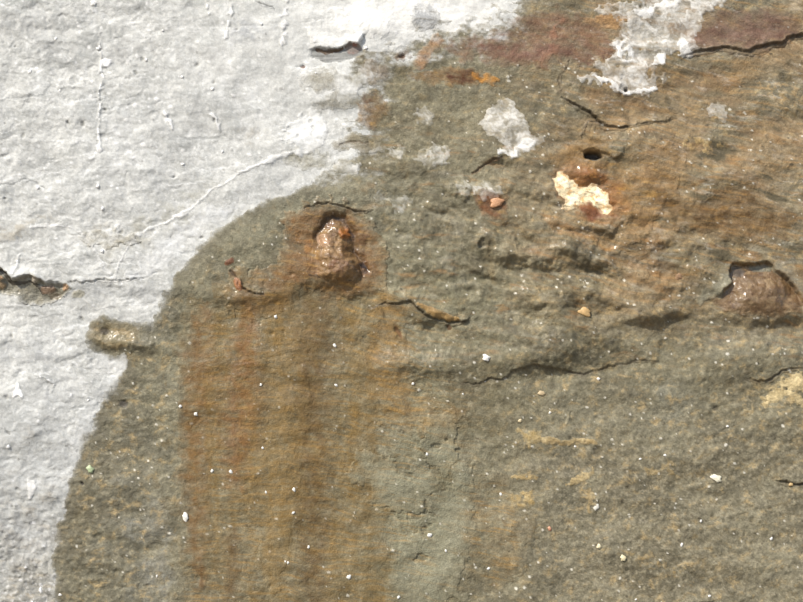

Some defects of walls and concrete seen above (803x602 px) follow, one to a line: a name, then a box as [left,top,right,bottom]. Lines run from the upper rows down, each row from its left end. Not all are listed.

spalling [308,33,364,63]
water stain [305,0,390,49]
water stain [409,0,803,99]
crack [681,31,803,58]
crack [555,58,677,137]
efflorescence [477,98,545,160]
spalling [552,171,613,222]
crack [29,223,144,285]
spalling [0,267,72,307]
crack [360,297,471,327]
corrosion [149,194,470,602]
water stain [384,461,477,602]